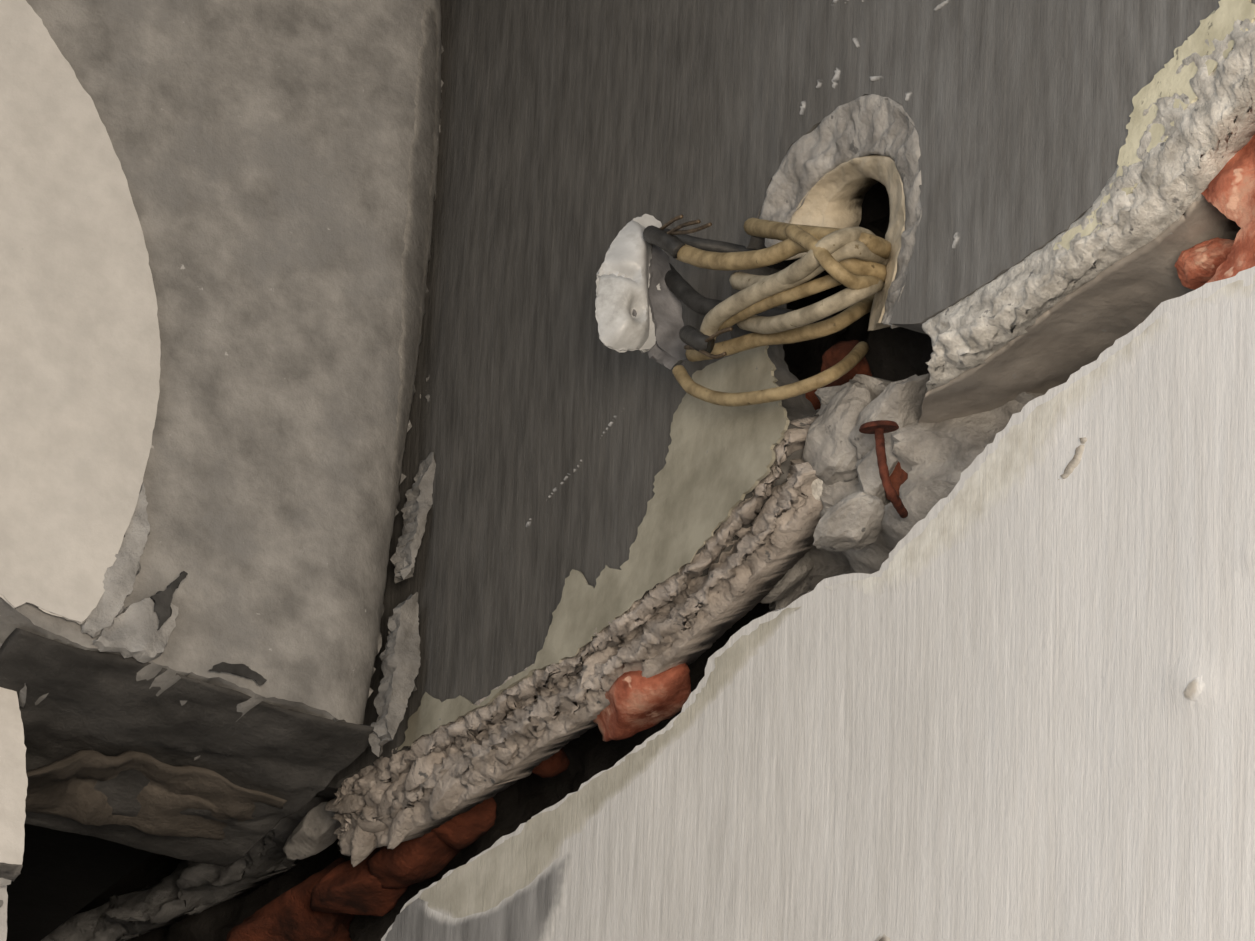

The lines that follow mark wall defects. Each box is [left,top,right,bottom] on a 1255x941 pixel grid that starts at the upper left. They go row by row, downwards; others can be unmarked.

spalling [759,94,922,331]
spalling [849,0,1255,460]
peeling [692,345,779,393]
spalling [821,340,859,372]
spalling [821,356,873,388]
spalling [0,483,374,867]
spalling [226,374,1045,941]
spalling [1183,675,1205,701]